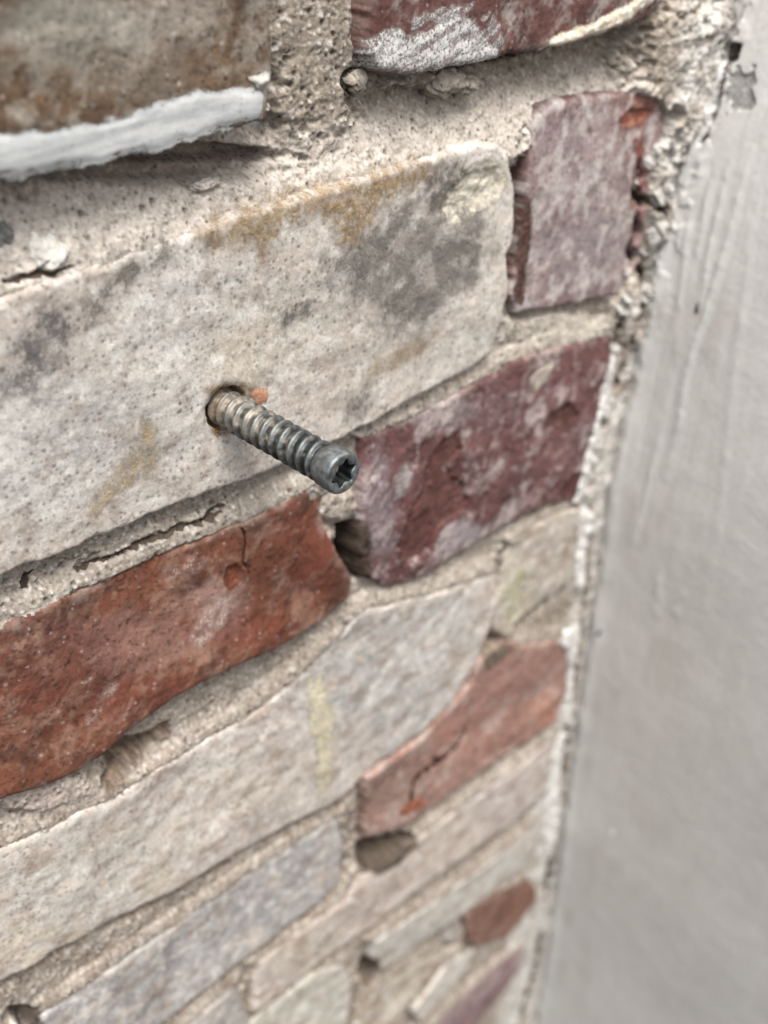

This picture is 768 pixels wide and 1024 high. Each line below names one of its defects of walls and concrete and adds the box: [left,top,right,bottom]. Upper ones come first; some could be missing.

peeling [724,40,756,114]
spalling [619,105,656,130]
spalling [631,128,679,208]
spalling [640,220,669,260]
spalling [614,282,653,316]
crack [74,504,250,573]
crack [19,569,34,589]
crack [409,724,467,800]